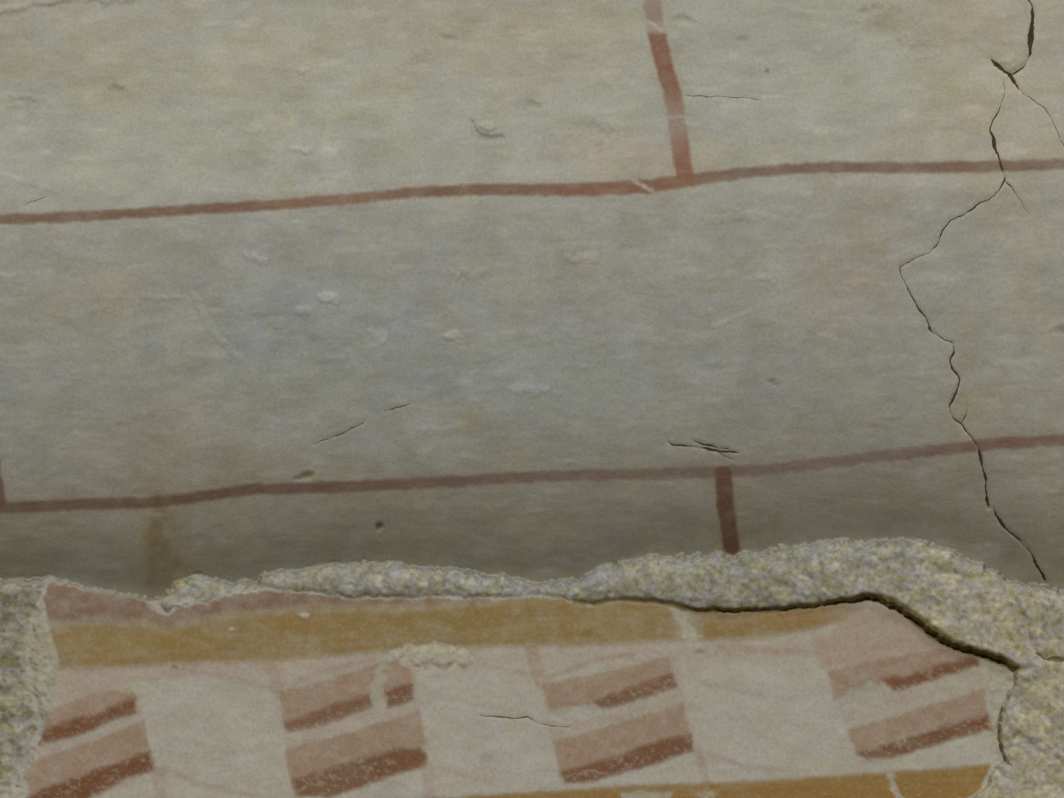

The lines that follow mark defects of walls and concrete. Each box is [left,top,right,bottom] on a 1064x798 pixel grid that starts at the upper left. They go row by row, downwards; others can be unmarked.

crack [899,0,1064,582]
crack [668,441,738,458]
spalling [0,575,78,795]
peeling [143,596,168,617]
spalling [224,539,1064,798]